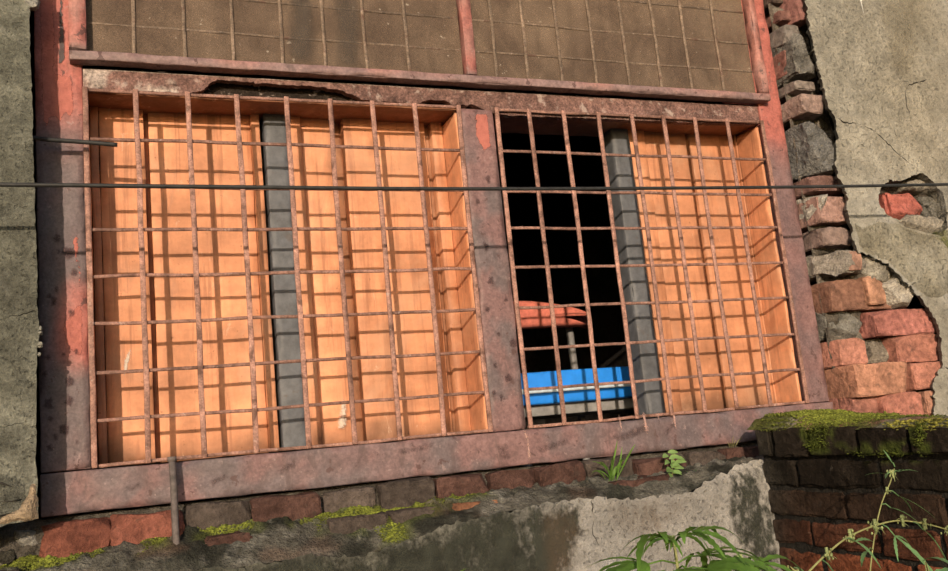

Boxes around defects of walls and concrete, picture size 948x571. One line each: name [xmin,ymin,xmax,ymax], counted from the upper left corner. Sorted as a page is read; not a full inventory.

spalling [763,0,948,416]
spalling [0,530,38,565]
water stain [261,507,580,571]